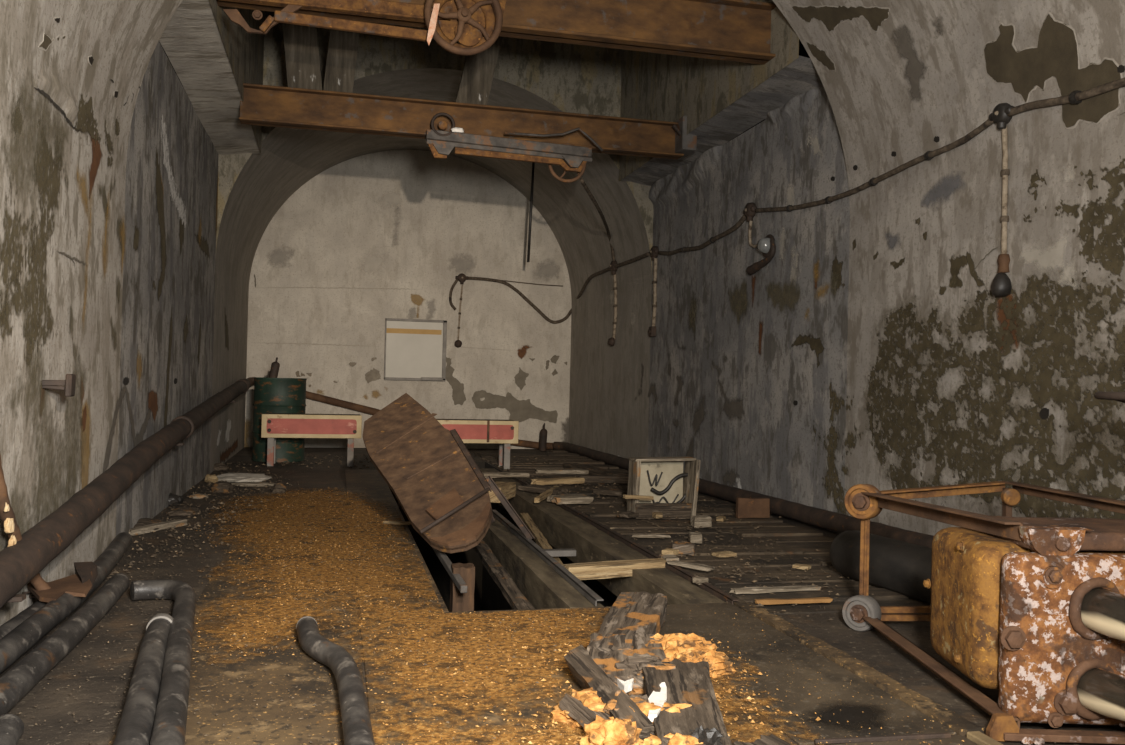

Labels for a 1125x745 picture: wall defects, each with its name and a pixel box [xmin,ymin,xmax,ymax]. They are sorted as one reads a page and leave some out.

flaking render [983,12,1123,129]
crack [34,87,81,132]
damp [99,181,139,251]
damp [0,90,120,535]
flaking render [446,355,567,423]